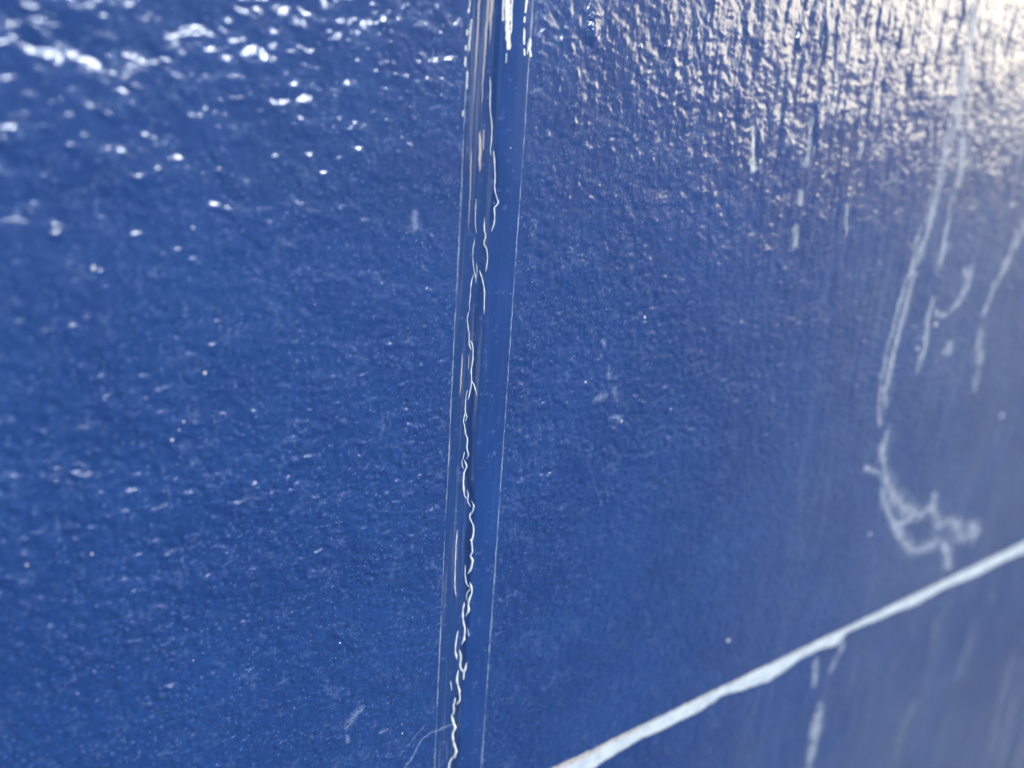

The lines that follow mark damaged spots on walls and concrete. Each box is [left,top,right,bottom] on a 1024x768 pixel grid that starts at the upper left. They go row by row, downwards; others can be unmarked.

crack [448,81,499,768]